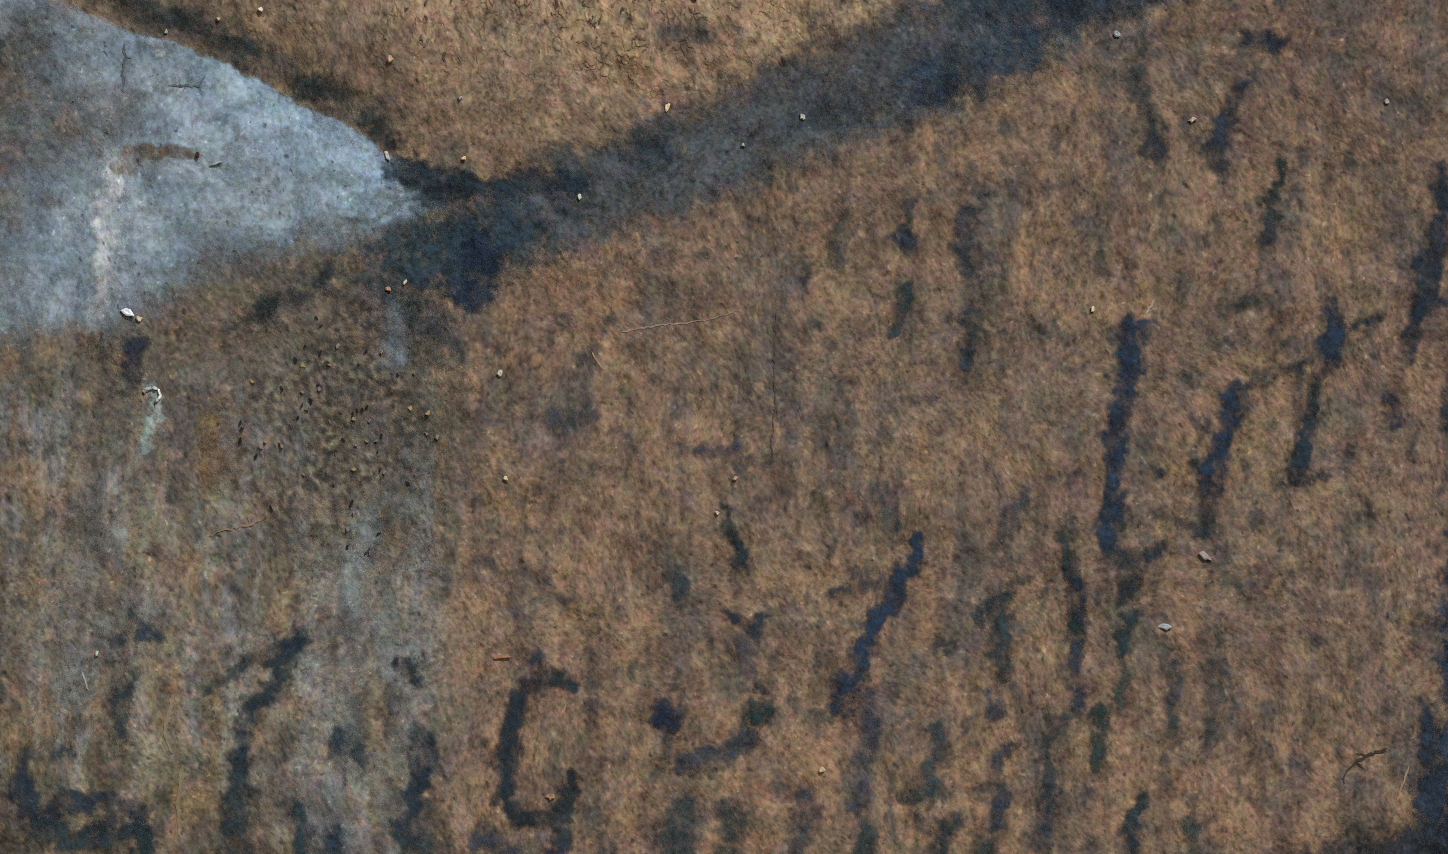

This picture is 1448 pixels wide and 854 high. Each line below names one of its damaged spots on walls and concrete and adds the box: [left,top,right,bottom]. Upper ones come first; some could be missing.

leakage [1240,29,1289,55]
leakage [364,0,1152,371]
efflorescence [90,149,128,320]
leakage [253,269,332,322]
leakage [122,337,164,455]
efflorescence [337,424,415,621]
leakage [666,565,690,600]
leakage [1166,659,1184,742]
leakage [1301,604,1448,854]
leakage [661,794,694,854]
leakage [714,800,737,854]
leakage [1118,791,1150,854]